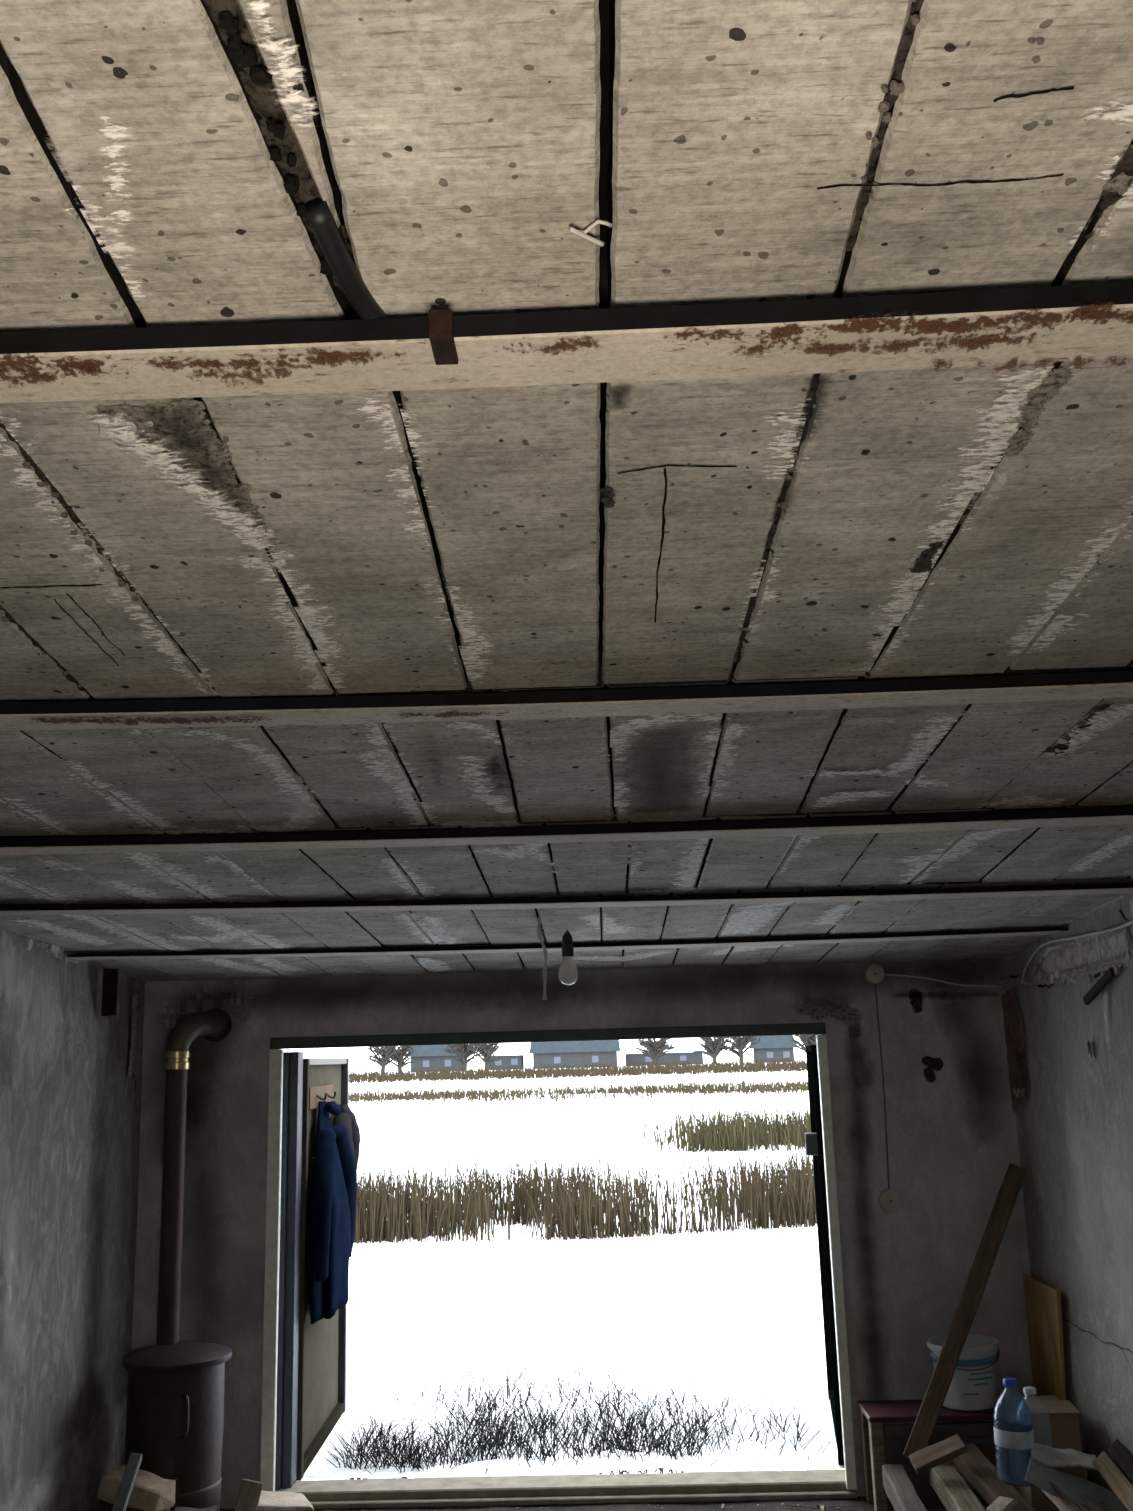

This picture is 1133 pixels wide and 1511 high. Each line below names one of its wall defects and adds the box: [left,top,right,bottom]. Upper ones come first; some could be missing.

leakage [250,0,316,127]
crack [993,87,1074,103]
leakage [65,116,151,300]
crack [817,174,1064,190]
rust [0,353,129,388]
rust [142,348,406,386]
rust [497,336,602,356]
rust [665,302,1133,373]
crack [618,465,737,623]
leakage [850,366,1079,672]
leakage [545,838,715,962]
flaking render [1031,929,1128,983]